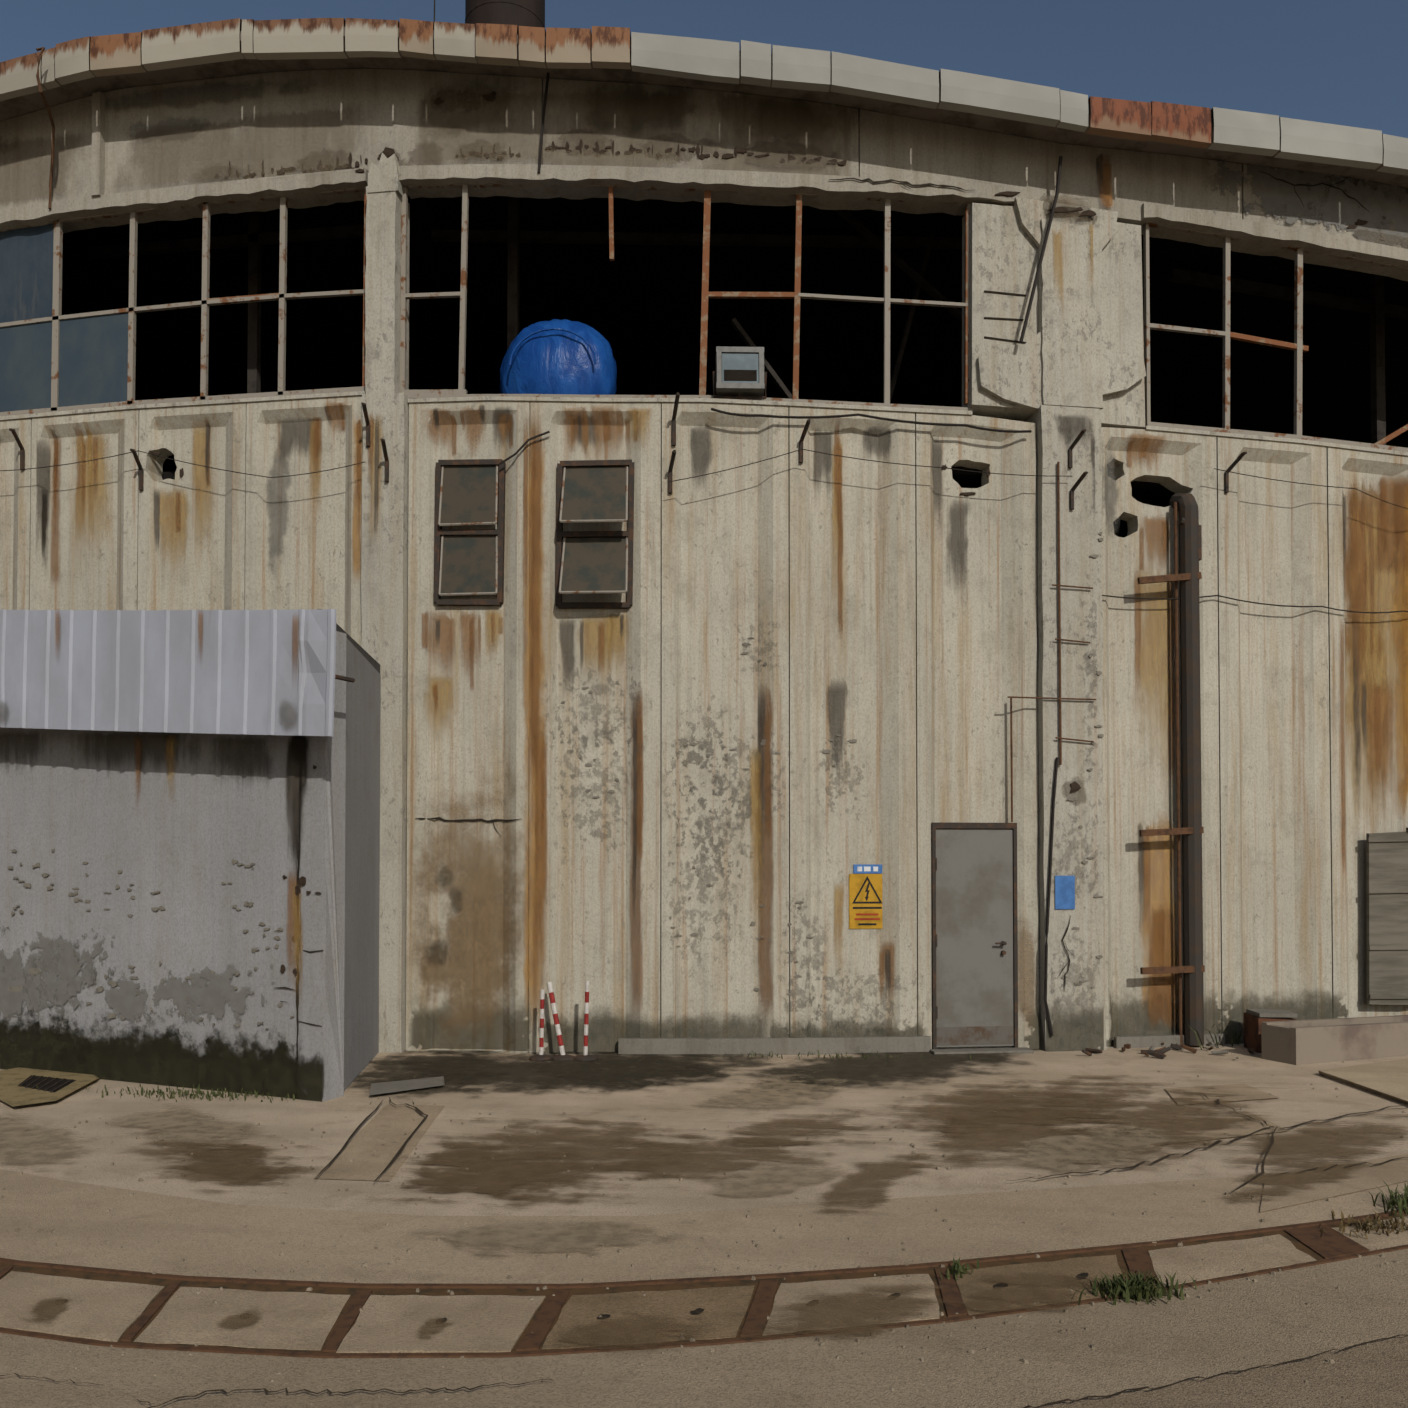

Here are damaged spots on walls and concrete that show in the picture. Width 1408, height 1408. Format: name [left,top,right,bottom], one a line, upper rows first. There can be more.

peeling [7,849,165,917]
spalling [282,875,321,895]
peeling [0,922,301,1029]